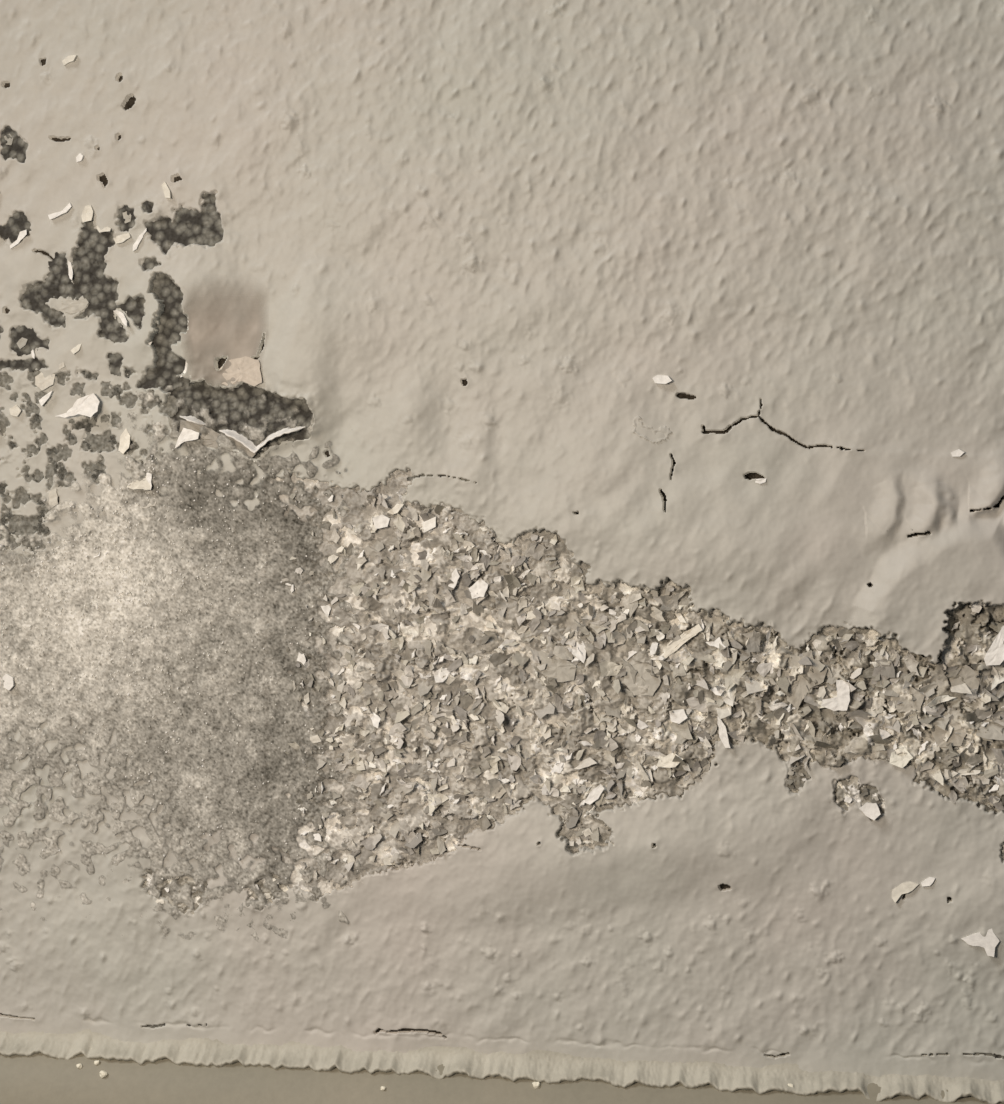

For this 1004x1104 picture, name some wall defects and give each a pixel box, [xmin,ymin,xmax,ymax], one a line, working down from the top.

peeling [0,126,28,163]
peeling [0,176,313,560]
crack [676,392,696,400]
crack [703,399,865,451]
damp [0,386,377,942]
flaking render [248,469,1004,909]
flaking render [143,869,207,914]